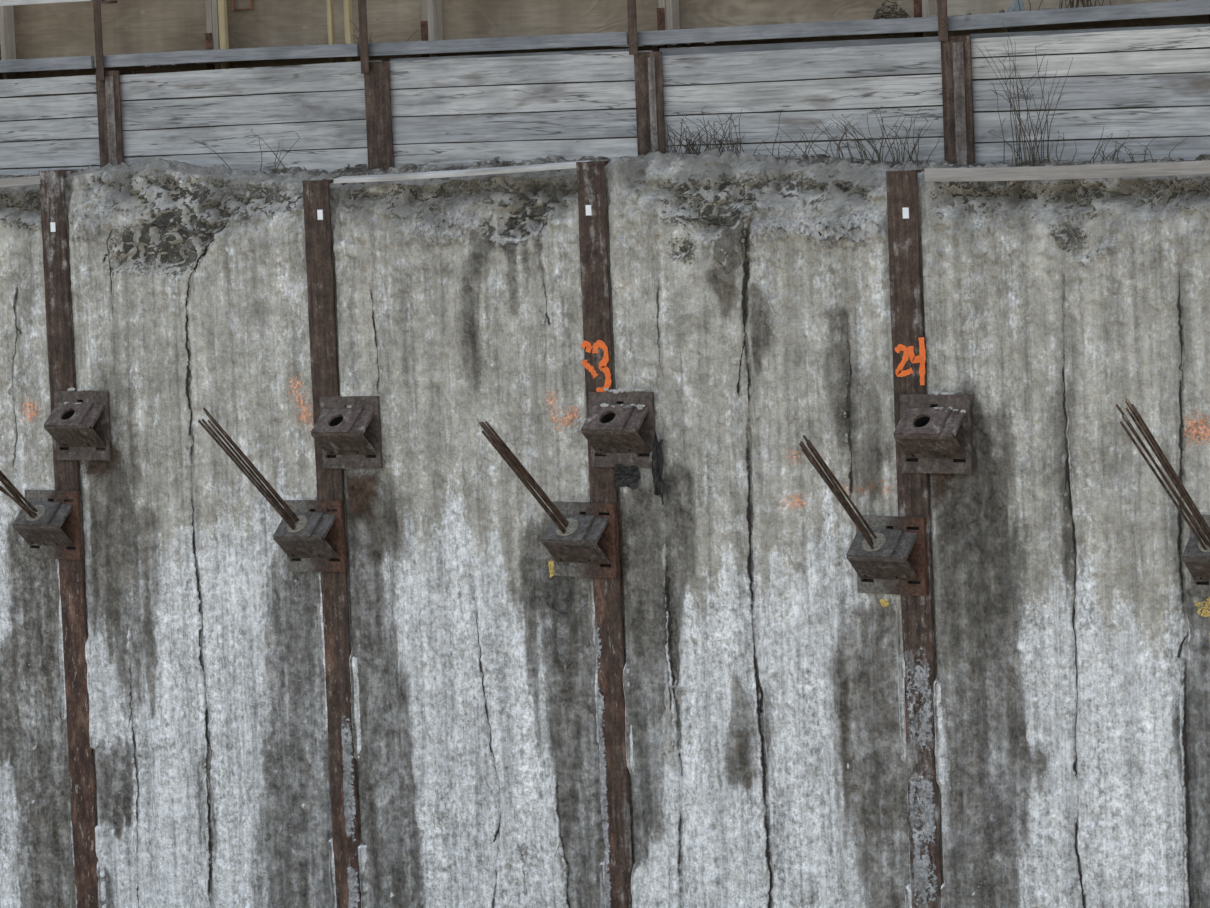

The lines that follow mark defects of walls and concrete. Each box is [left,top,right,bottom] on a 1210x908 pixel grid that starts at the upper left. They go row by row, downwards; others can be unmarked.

damp [0,520,75,908]
crack [185,223,226,905]
damp [251,554,335,908]
damp [345,476,424,908]
damp [512,516,605,908]
crack [737,228,773,908]
damp [830,599,910,908]
crack [1177,275,1192,908]
damp [1173,589,1210,908]